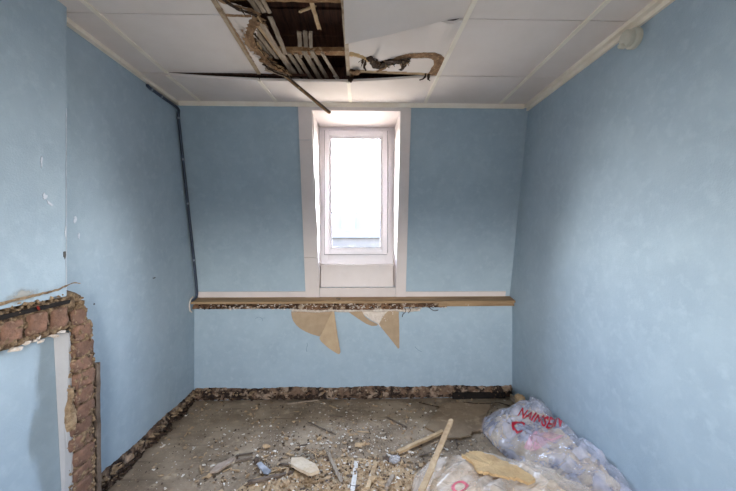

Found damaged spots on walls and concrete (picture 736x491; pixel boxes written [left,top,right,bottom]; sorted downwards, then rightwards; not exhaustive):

peeling [358,56,411,73]
spalling [189,296,514,321]
flaking render [0,282,97,491]